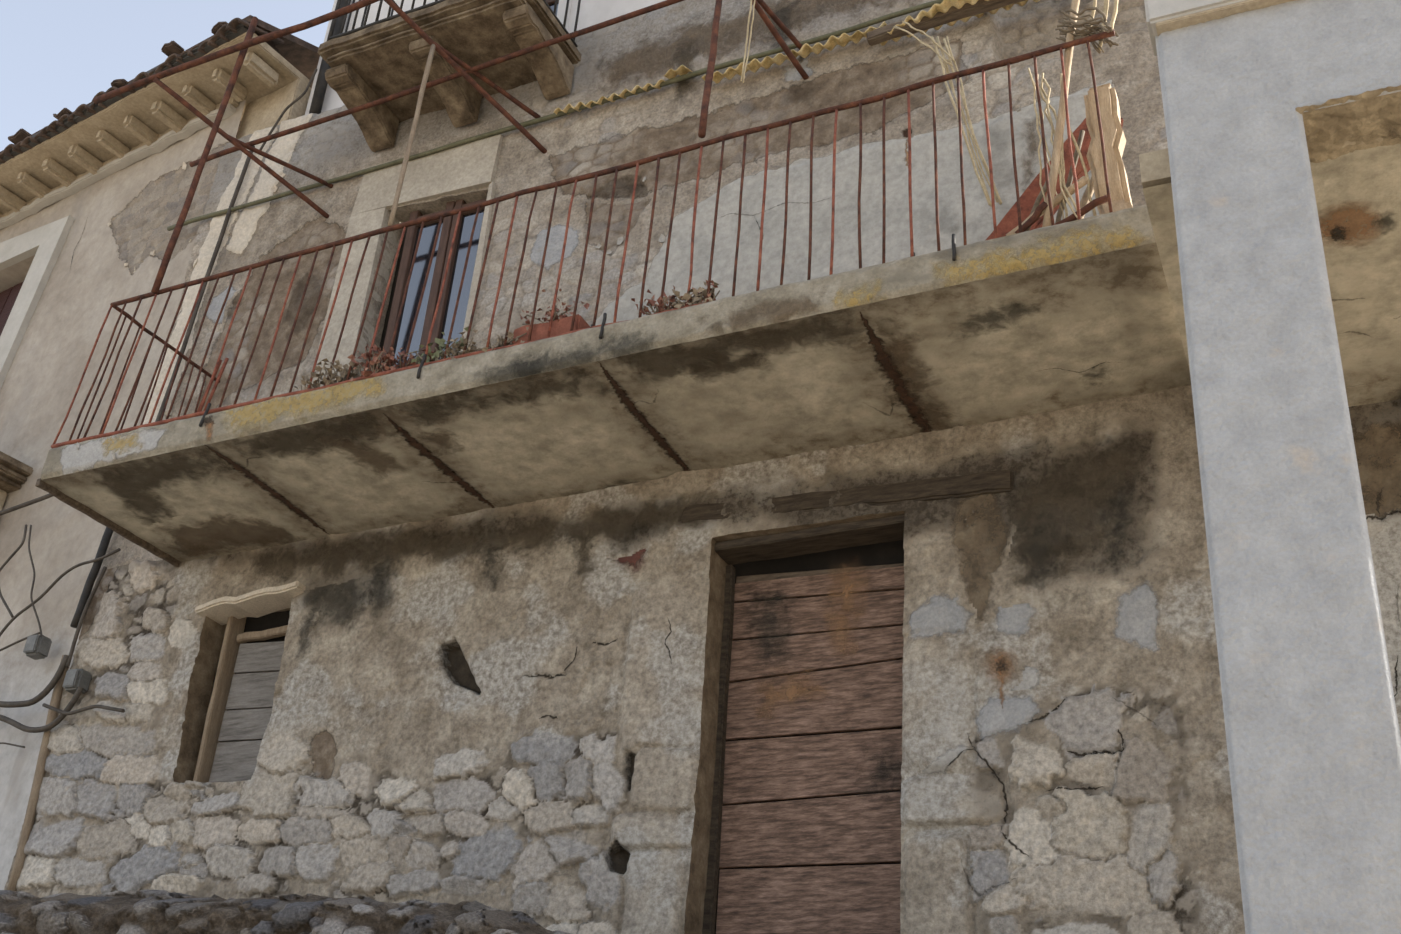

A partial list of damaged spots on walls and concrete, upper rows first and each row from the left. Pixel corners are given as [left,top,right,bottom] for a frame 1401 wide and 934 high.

flaking render [548,39,1115,327]
spalling [60,112,347,475]
water stain [413,300,857,449]
crack [597,361,691,471]
crack [860,312,932,433]
water stain [880,329,951,430]
water stain [968,303,1029,327]
water stain [94,448,705,649]
rust [993,653,1011,709]